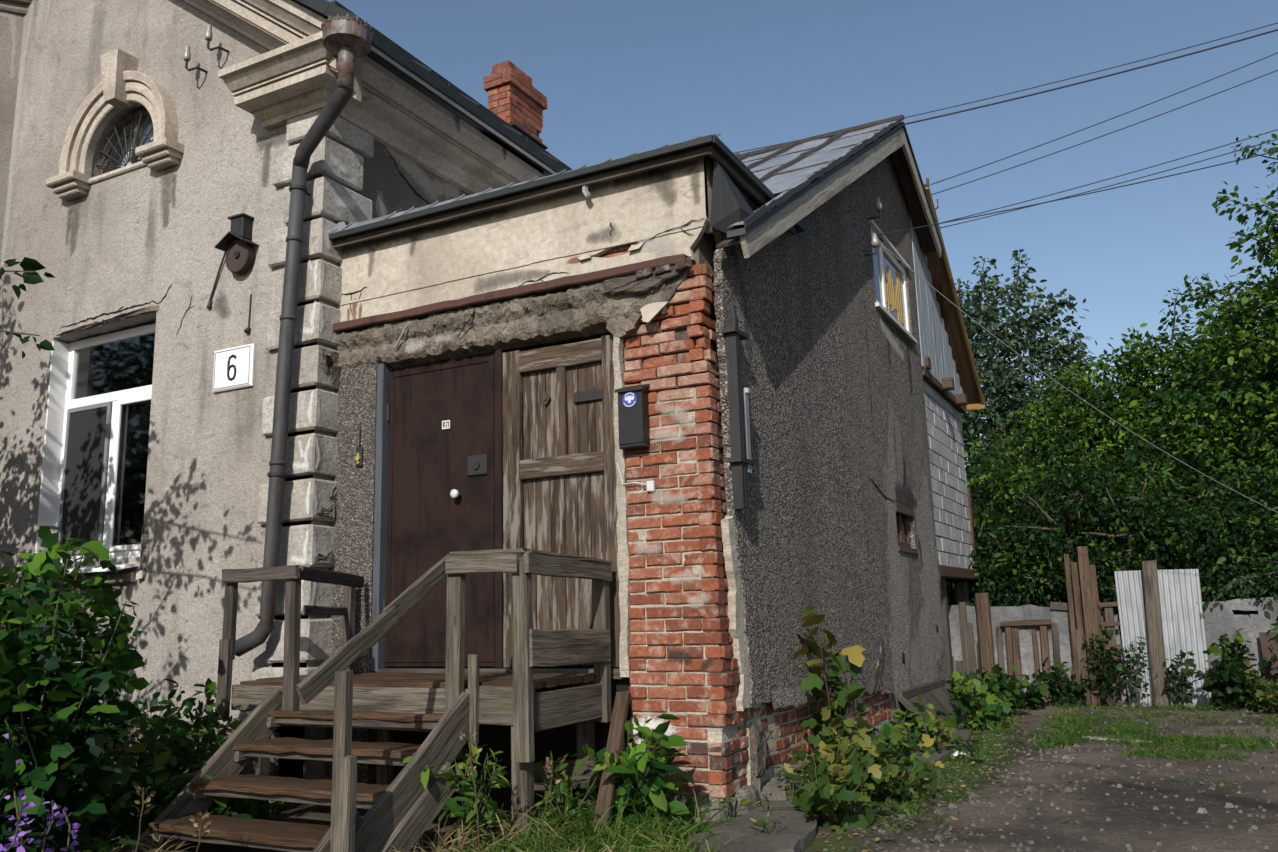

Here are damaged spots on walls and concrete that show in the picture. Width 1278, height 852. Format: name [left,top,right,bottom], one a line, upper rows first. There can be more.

crack [642,217,705,242]
spalling [577,241,645,261]
crack [519,272,567,286]
spalling [602,256,693,332]